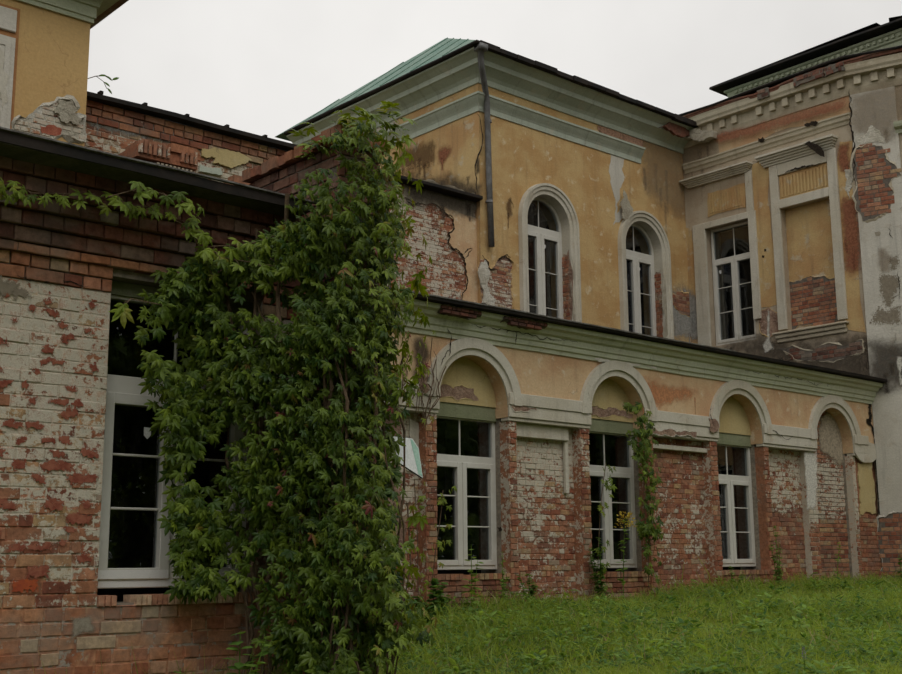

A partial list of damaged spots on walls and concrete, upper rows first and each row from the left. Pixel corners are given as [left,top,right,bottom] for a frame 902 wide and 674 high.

spalling [11,95,87,144]
crack [848,94,856,184]
spalling [838,143,902,272]
peeling [0,275,95,406]
spalling [437,257,548,330]
spalling [556,249,575,321]
spalling [758,307,779,337]
spalling [789,275,839,330]
peeling [48,384,84,420]
peeling [0,418,100,486]
peeling [0,497,93,562]
spalling [876,510,902,578]